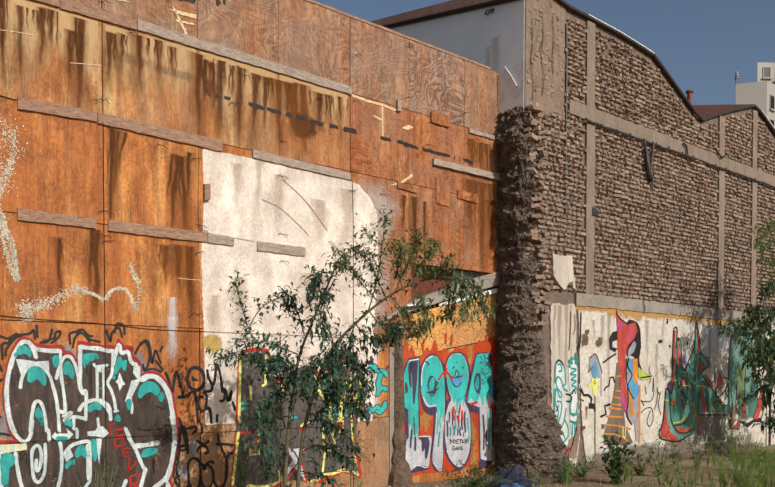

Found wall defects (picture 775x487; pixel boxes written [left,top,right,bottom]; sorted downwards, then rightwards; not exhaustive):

damp [0,0,84,84]
damp [107,31,177,70]
damp [192,52,348,129]
damp [108,128,127,199]
damp [168,152,193,207]
damp [402,195,426,264]
damp [466,178,494,238]
peeling [548,254,576,291]